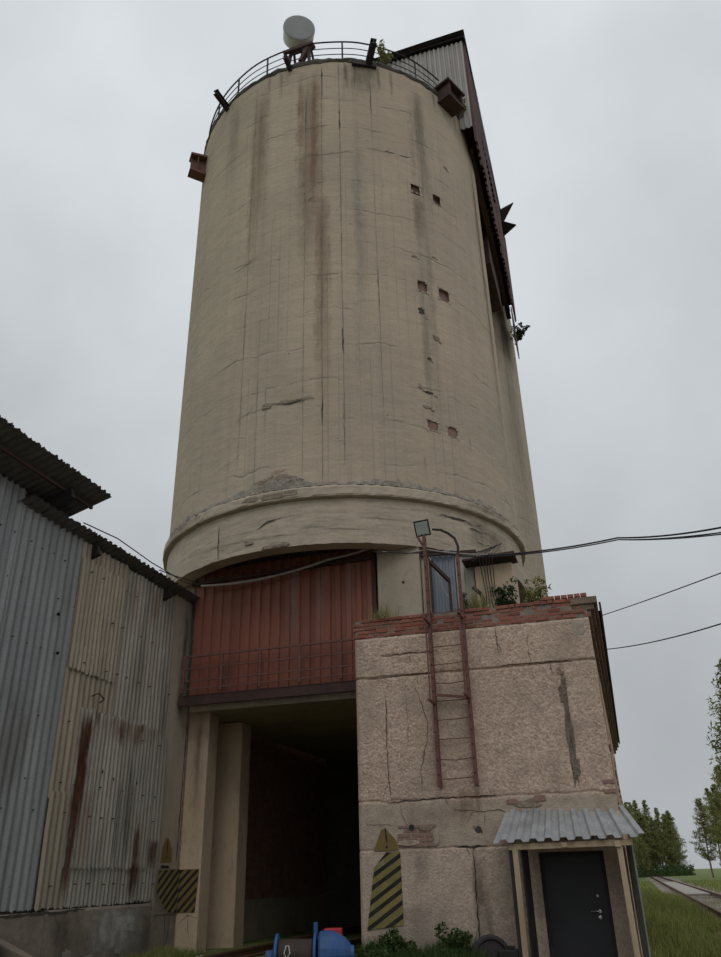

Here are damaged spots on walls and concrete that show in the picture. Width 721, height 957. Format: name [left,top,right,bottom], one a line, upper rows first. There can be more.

rust [64,714,100,884]
rust [129,829,158,891]
flaking render [397,824,440,848]